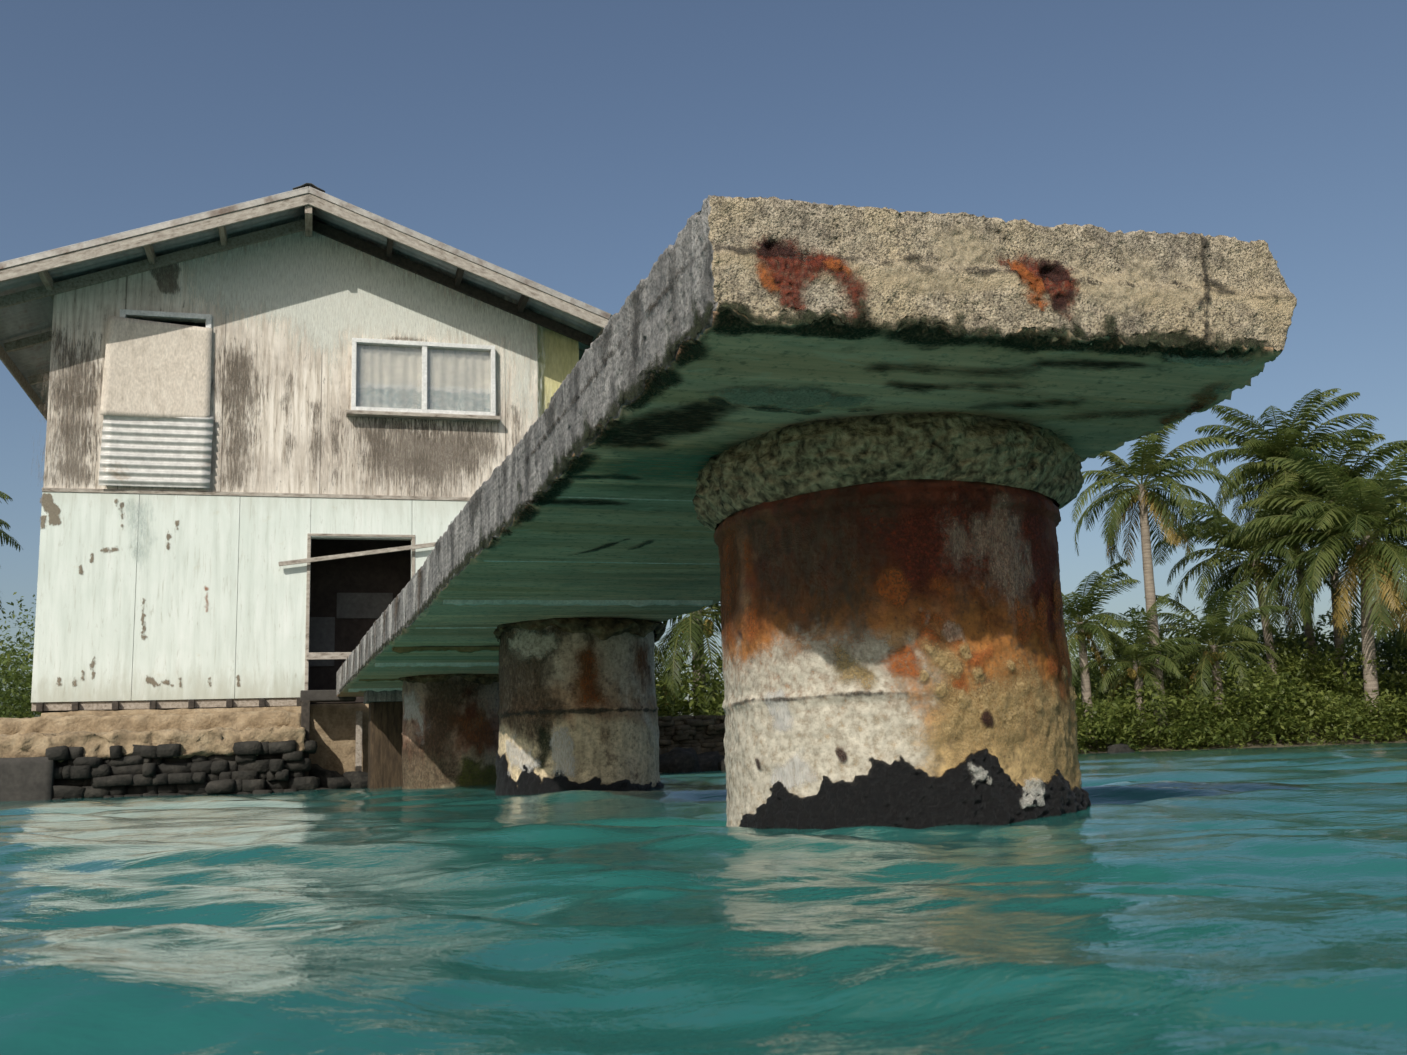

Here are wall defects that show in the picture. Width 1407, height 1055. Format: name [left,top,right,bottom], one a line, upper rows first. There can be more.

corrosion [757,241,866,317]
corrosion [1000,255,1078,311]
damp [41,323,103,487]
damp [212,346,291,491]
damp [286,289,737,550]
peeling [40,493,61,528]
peeling [79,547,119,574]
damp [340,521,453,682]
peeling [57,658,95,686]
peeling [146,676,181,687]